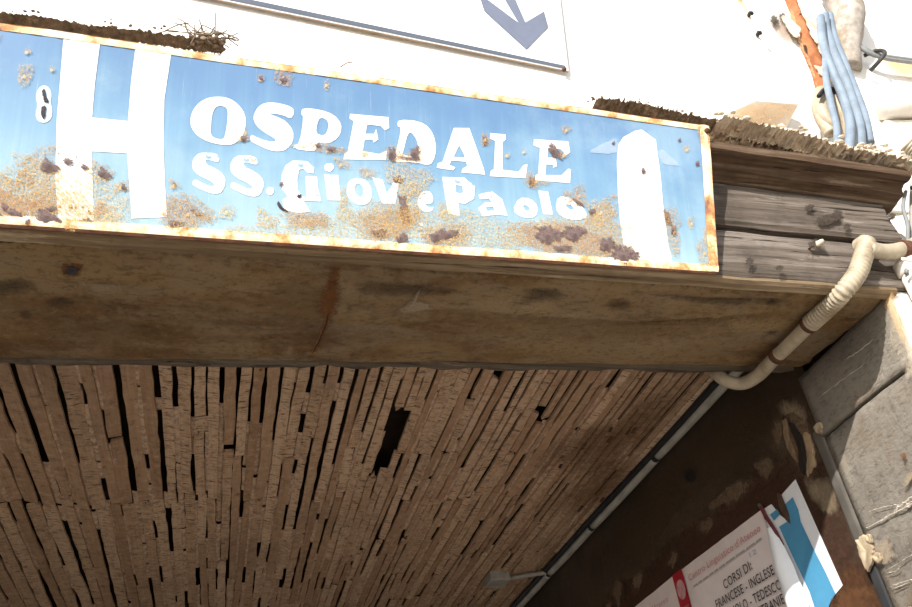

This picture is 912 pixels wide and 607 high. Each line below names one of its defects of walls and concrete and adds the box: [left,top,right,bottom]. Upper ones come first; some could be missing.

rust [311,267,340,354]
flaking render [602,396,894,607]